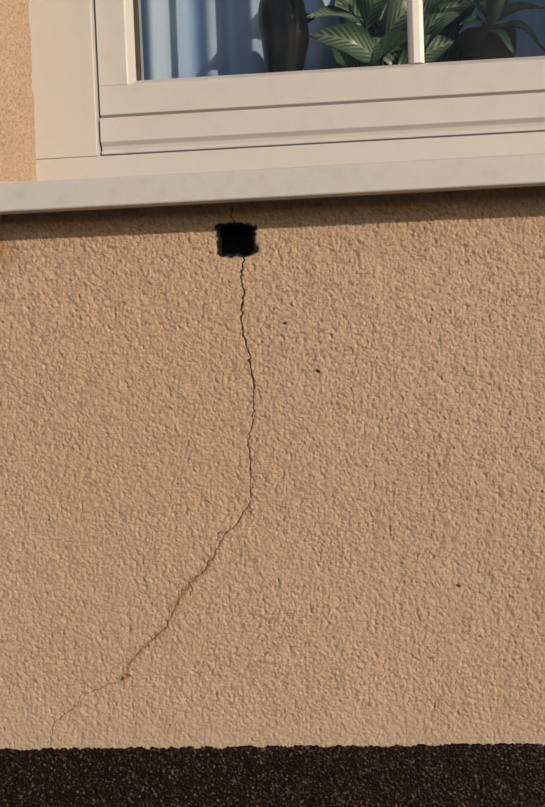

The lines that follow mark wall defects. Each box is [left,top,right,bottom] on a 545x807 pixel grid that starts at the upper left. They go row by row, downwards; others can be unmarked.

crack [50,257,255,745]